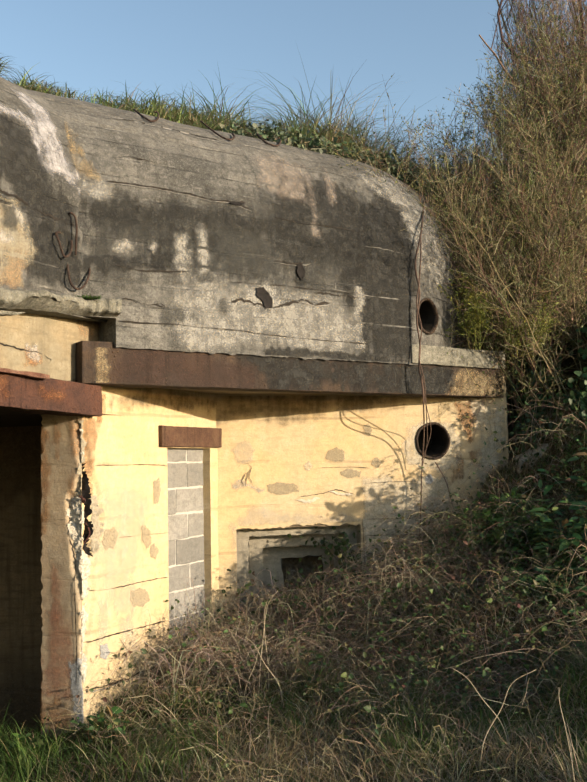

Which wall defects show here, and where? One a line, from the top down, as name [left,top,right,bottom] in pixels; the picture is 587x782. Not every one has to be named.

damp [0,92,454,420]
spalling [256,287,273,309]
crack [231,291,359,310]
crack [0,343,50,364]
rust [97,347,110,383]
spalling [66,420,104,684]